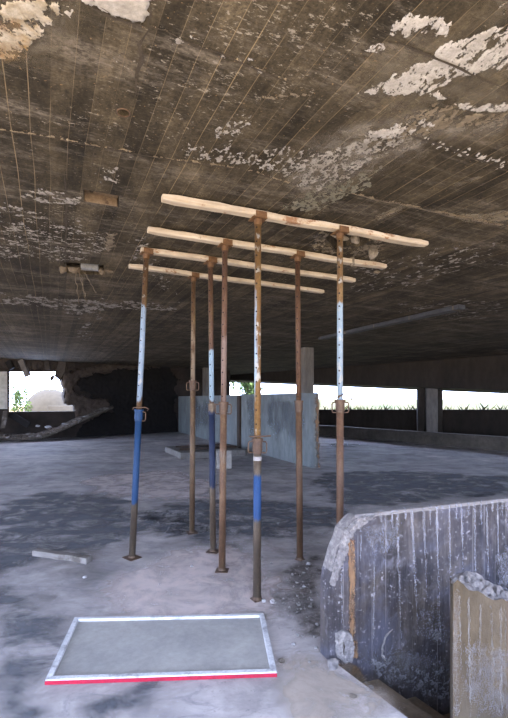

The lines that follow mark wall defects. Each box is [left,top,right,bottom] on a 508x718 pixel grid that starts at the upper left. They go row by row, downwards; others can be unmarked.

peeling [0,0,73,59]
spalling [82,0,151,23]
spalling [180,12,508,215]
damp [293,124,423,195]
spalling [0,364,159,441]
spalling [329,514,376,588]
rust [348,539,364,680]
damp [422,596,458,669]